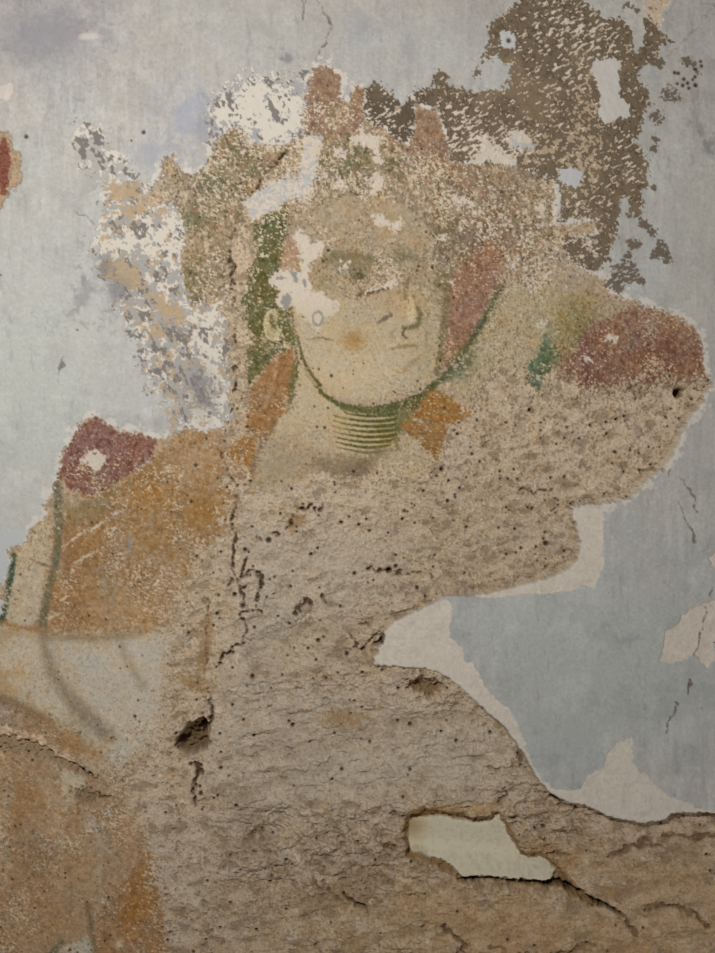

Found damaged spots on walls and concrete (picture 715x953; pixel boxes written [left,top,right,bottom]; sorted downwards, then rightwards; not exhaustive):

peeling [0,132,22,209]
peeling [333,0,684,296]
peeling [68,70,329,436]
peeling [269,229,341,334]
peeling [80,449,107,475]
crack [228,504,324,621]
crack [367,566,402,576]
crack [353,622,385,651]
spalling [108,362,715,953]
crack [0,725,94,778]
crack [191,761,205,805]
crack [460,829,715,938]